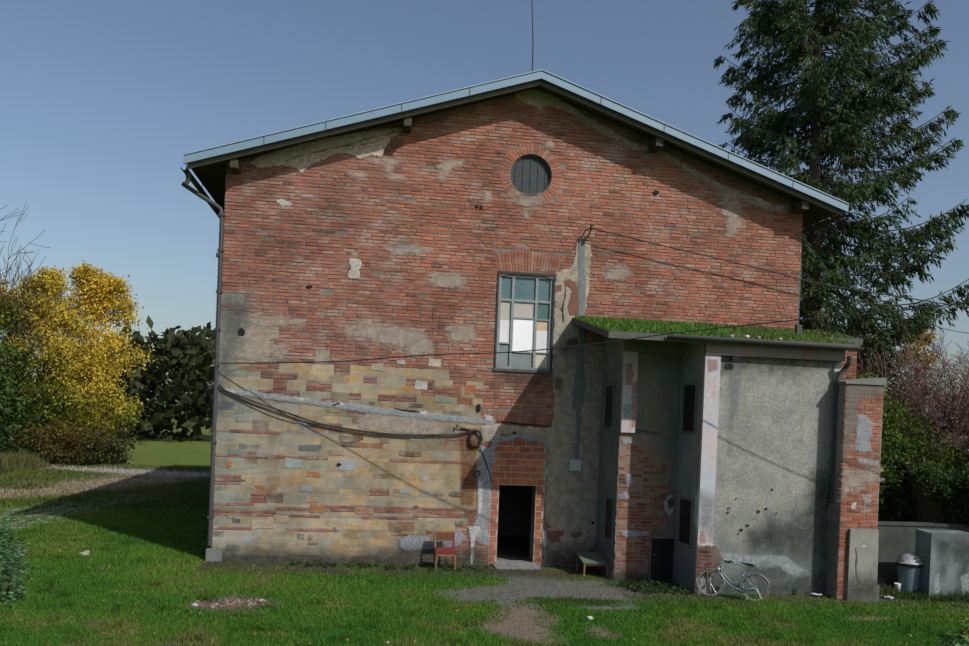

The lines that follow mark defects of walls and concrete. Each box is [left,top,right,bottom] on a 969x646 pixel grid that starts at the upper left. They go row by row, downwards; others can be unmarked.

peeling [515,89,647,150]
peeling [250,127,406,180]
peeling [659,150,789,213]
spalling [556,279,579,316]
leakage [841,467,883,494]
peeling [468,480,483,565]
leakage [756,471,830,556]